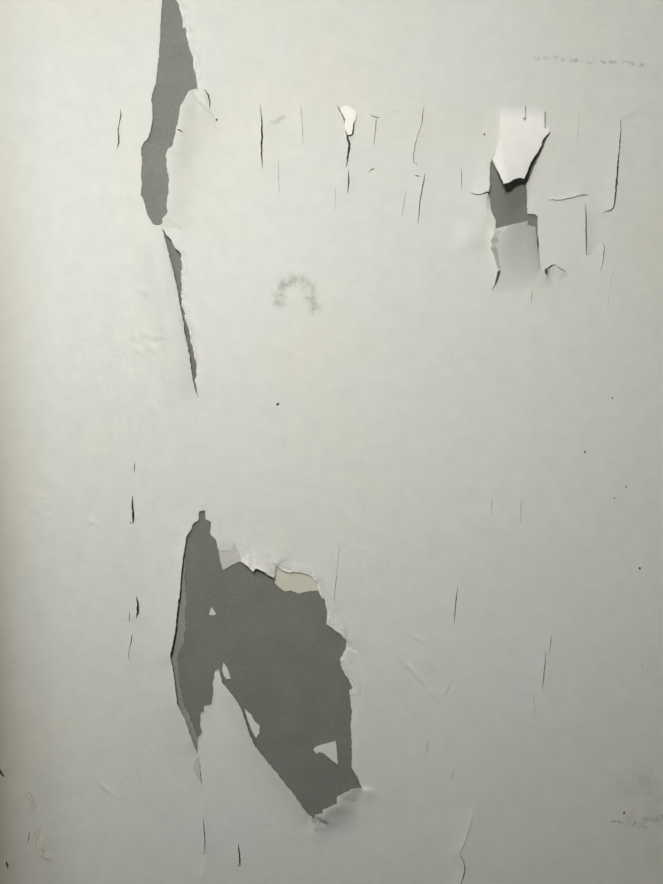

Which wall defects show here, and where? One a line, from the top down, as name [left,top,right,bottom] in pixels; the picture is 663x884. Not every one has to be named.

peeling [130,0,214,409]
peeling [333,102,363,199]
peeling [467,103,573,306]
crack [544,114,627,277]
peeling [160,500,372,884]
crack [454,803,479,884]